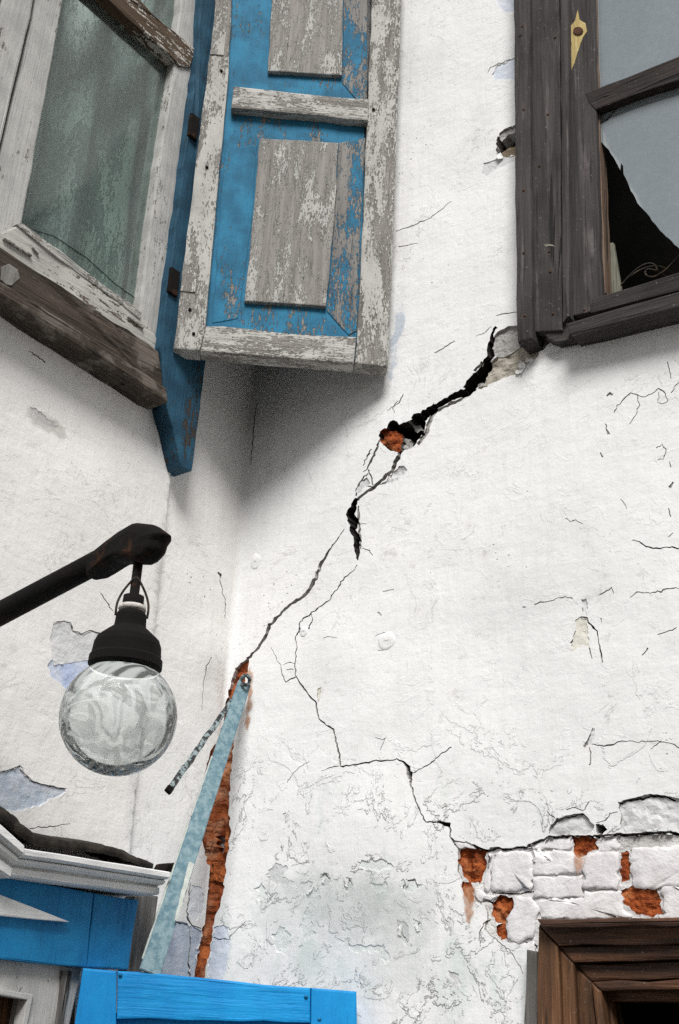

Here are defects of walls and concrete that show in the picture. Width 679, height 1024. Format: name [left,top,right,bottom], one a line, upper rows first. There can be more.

spalling [478,326,550,389]
crack [600,362,679,457]
crack [632,444,679,549]
peeling [47,620,100,689]
crack [176,312,517,978]
peeling [571,599,590,651]
crack [523,587,679,662]
crack [583,728,679,765]
peeling [0,765,67,812]
peeling [161,862,231,980]
spalling [454,794,679,973]